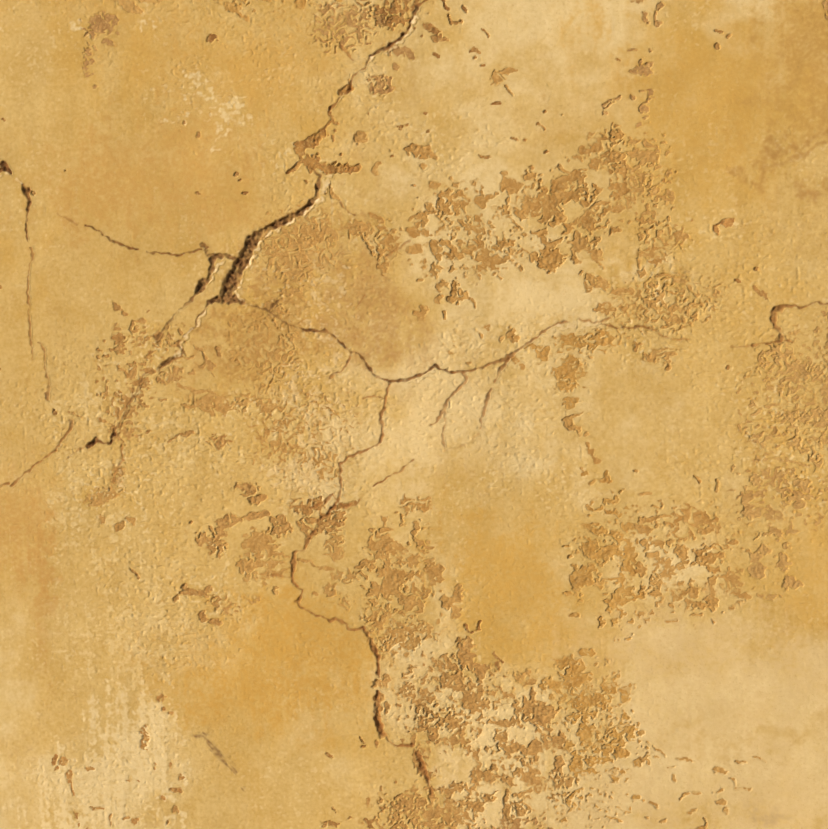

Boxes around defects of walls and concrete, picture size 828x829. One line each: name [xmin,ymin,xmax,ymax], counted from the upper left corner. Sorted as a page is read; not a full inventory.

spalling [80,10,120,78]
crack [328,0,430,111]
spalling [310,0,449,58]
spalling [441,0,468,25]
spalling [627,48,654,76]
spalling [631,0,664,27]
spalling [713,218,735,236]
crack [730,300,828,349]
crack [0,159,690,797]
spalling [96,89,721,829]
spalling [563,327,828,628]
spalling [51,754,75,796]